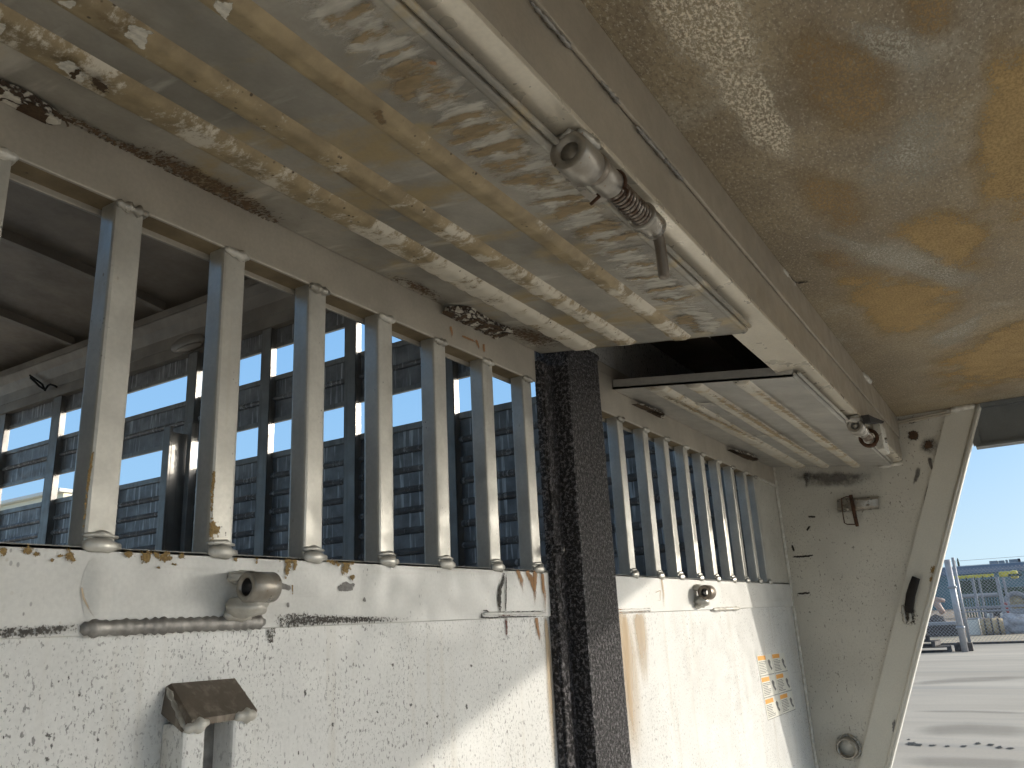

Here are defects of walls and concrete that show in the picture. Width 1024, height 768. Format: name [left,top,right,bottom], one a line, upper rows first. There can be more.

peeling [55,60,86,82]
peeling [124,24,153,50]
peeling [213,0,233,21]
peeling [16,103,74,127]
corrosion [62,112,283,223]
damp [433,109,595,219]
damp [973,49,1024,223]
damp [575,220,693,302]
damp [936,320,1024,391]
corrosion [209,471,220,541]
corrosion [124,550,185,569]
corrosion [516,570,552,705]